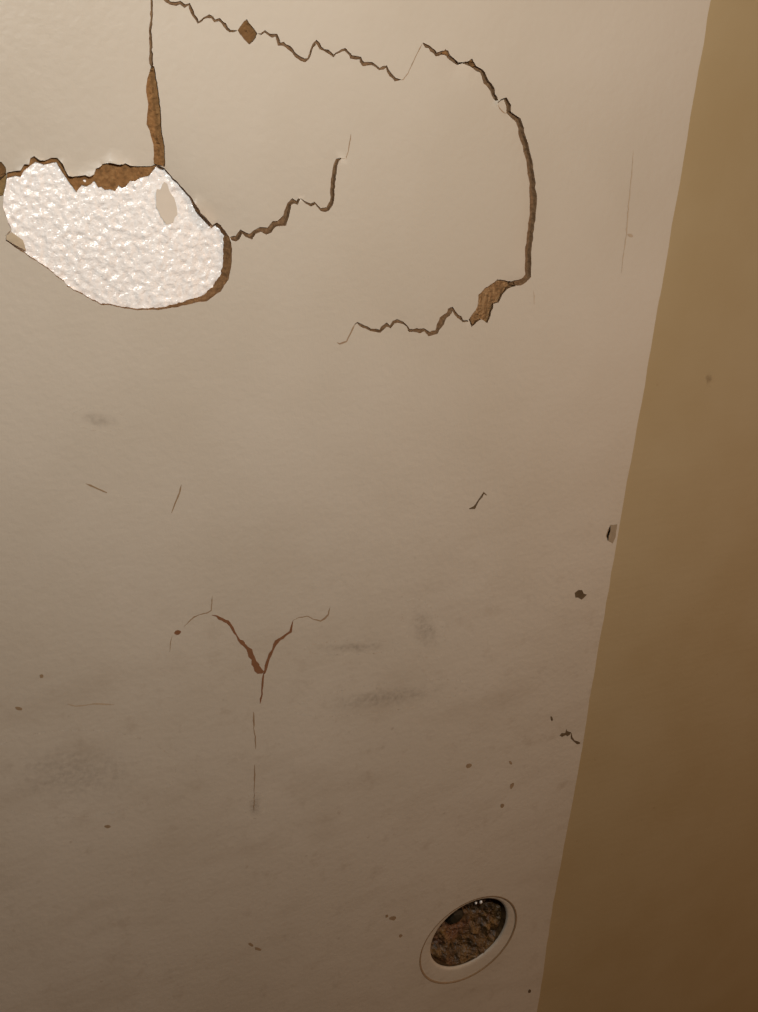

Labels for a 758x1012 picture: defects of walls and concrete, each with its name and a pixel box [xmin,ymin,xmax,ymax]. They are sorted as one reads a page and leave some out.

spalling [0,156,232,310]
crack [146,0,537,286]
crack [337,307,468,344]
crack [170,601,330,808]